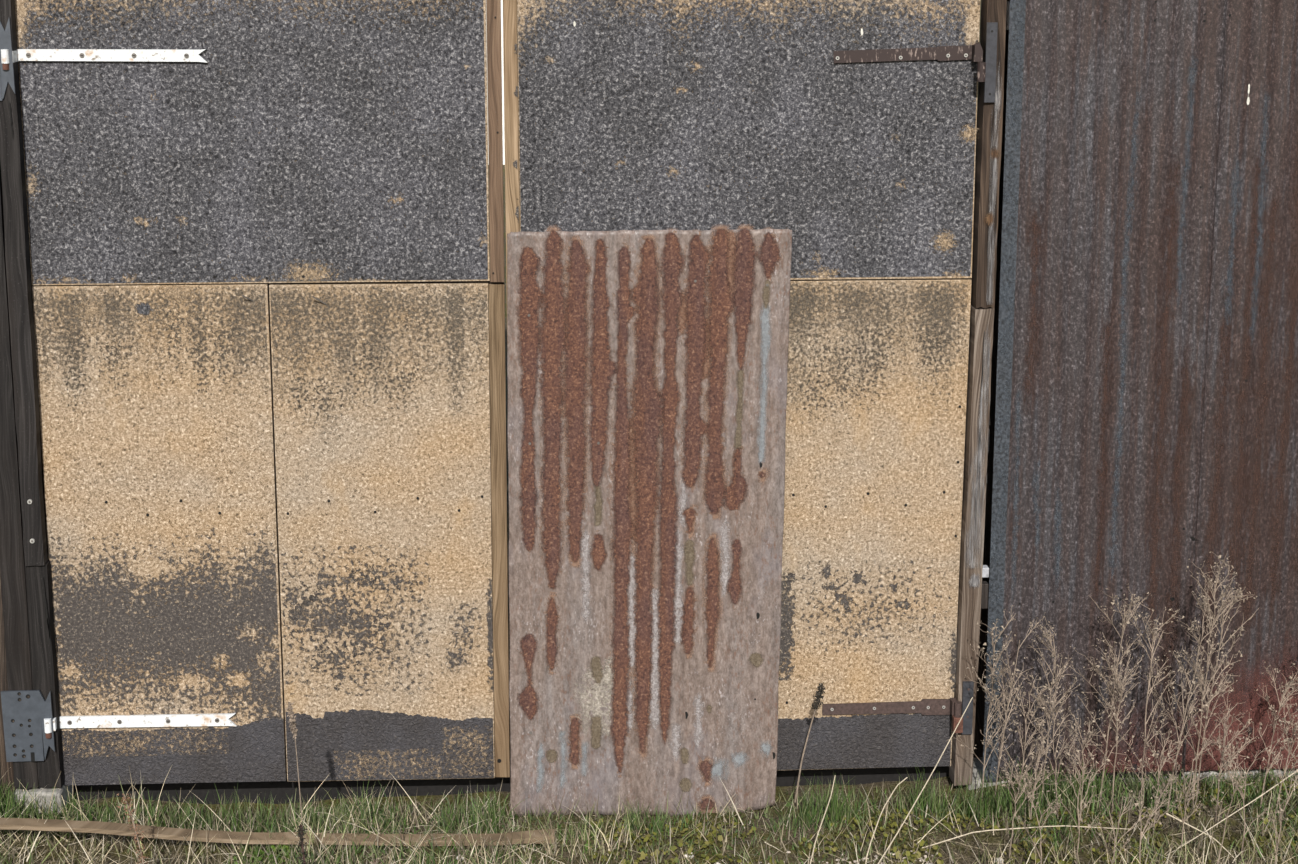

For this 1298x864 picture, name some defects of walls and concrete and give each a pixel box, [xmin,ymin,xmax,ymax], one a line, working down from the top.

corrosion [518,225,780,777]
damp [49,525,494,723]
damp [779,558,953,680]
corrosion [680,748,715,814]
corrosion [1095,676,1298,773]